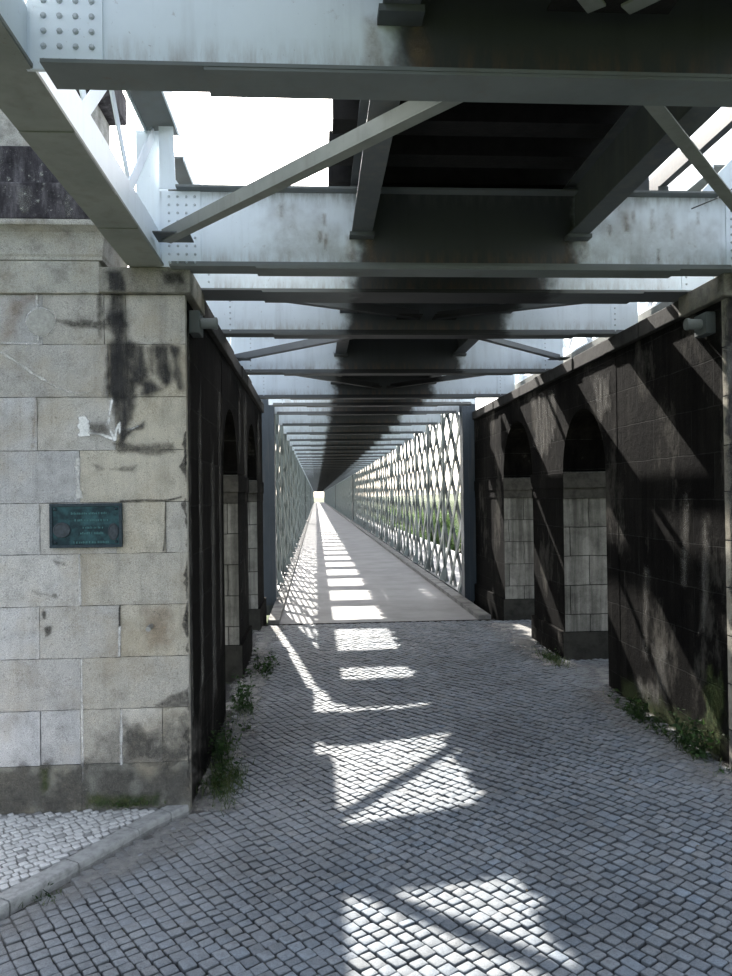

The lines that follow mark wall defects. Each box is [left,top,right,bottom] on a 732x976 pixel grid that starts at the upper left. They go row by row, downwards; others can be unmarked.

water stain [64,271,184,453]
water stain [723,296,732,516]